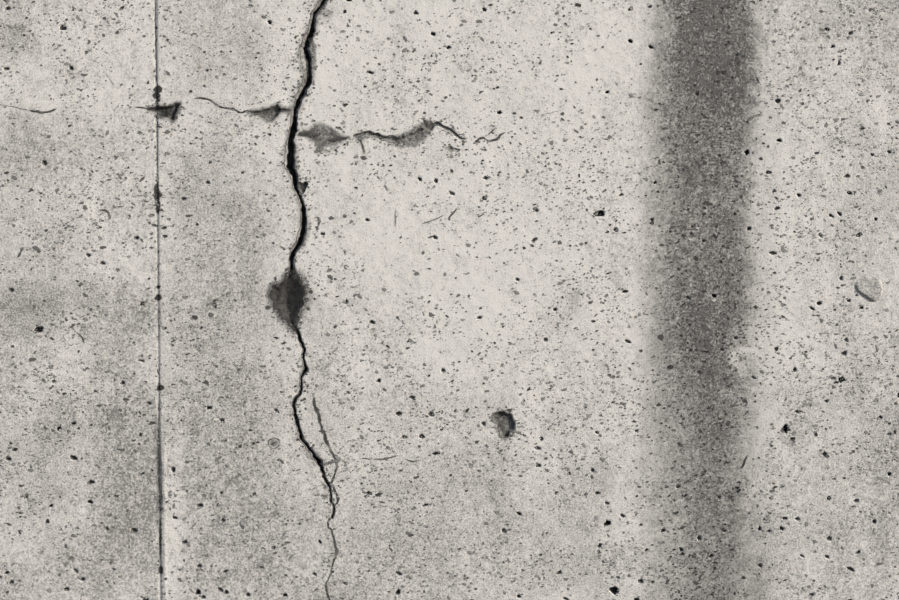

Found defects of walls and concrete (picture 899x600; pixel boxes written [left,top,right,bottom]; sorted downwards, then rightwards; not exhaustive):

crack [196,0,327,277]
crack [355,118,504,153]
water stain [651,0,760,600]
crack [291,324,340,600]
crack [361,454,419,462]